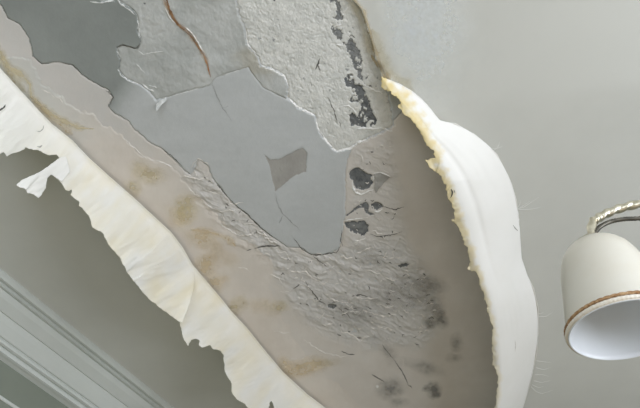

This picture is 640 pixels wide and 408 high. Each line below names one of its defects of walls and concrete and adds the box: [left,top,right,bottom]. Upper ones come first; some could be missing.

peeling [0,68,325,408]
peeling [0,0,374,254]
corrosion [165,0,210,75]
peeling [237,0,539,408]